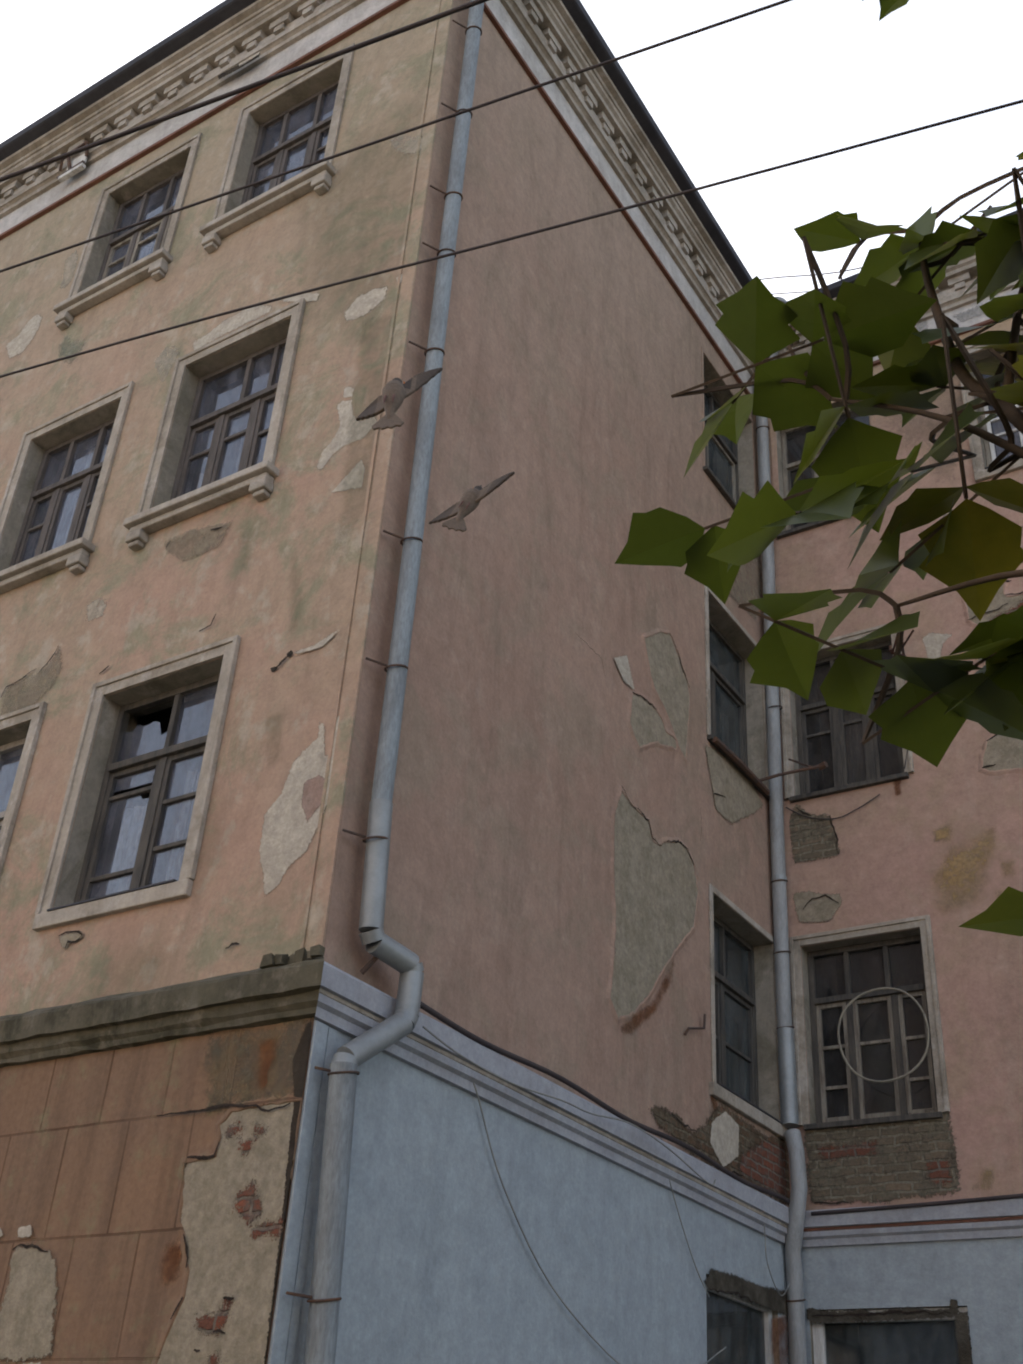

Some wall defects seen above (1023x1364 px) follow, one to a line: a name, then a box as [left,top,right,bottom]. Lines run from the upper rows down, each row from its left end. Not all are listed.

peeling [317,386,377,470]
spalling [922,540,1023,659]
spalling [1,645,62,714]
peeling [259,716,339,894]
spalling [615,655,679,760]
spalling [789,804,840,863]
spalling [973,731,1023,780]
spalling [145,1022,311,1364]
spalling [648,1104,790,1205]
spalling [804,1109,961,1205]
spalling [0,1225,59,1364]